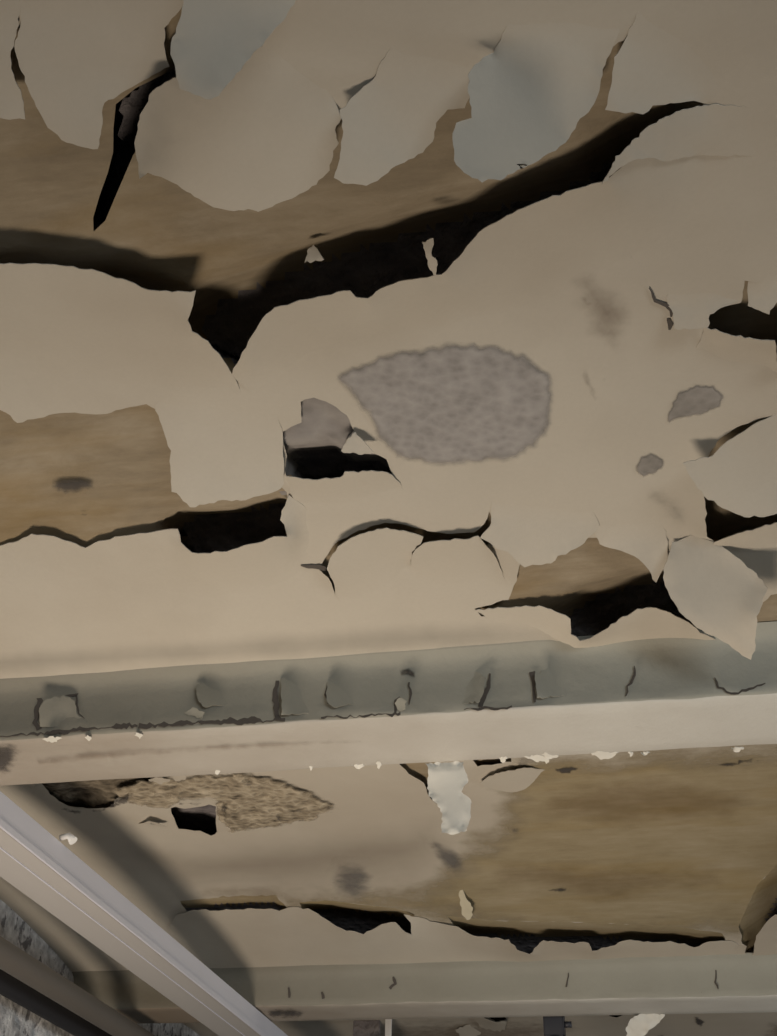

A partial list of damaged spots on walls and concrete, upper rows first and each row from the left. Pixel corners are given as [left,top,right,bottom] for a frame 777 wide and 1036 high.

peeling [0,0,756,394]
peeling [666,275,777,372]
peeling [0,345,550,597]
peeling [320,414,777,660]
crack [32,693,84,731]
crack [272,678,309,718]
crack [462,671,491,707]
crack [529,668,566,702]
crack [625,666,636,696]
crack [714,678,766,695]
spalling [26,770,333,836]
peeling [167,746,777,964]